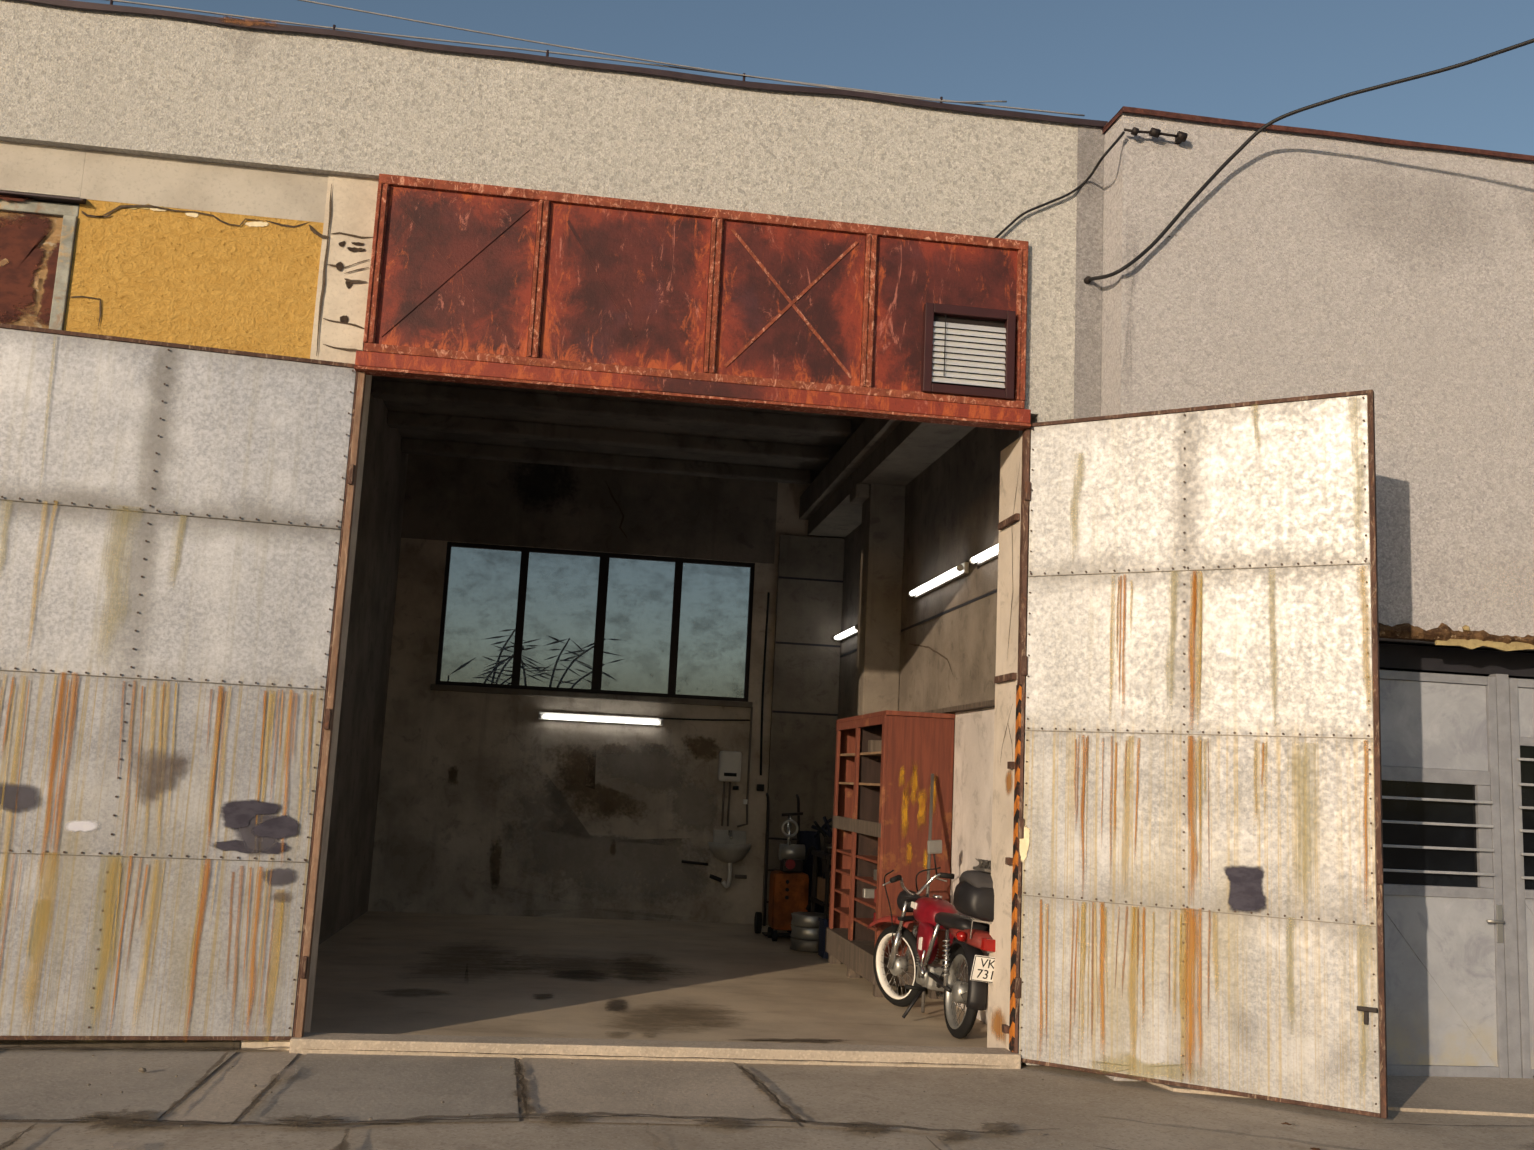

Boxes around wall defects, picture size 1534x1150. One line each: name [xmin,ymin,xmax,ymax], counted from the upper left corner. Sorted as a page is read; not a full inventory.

crack [81,184,372,356]
corrosion [1110,574,1132,696]
corrosion [1189,571,1202,706]
spalling [1379,622,1534,651]
corrosion [30,672,79,1001]
corrosion [207,686,229,841]
corrosion [1075,734,1140,873]
corrosion [1188,736,1209,888]
corrosion [187,859,283,1028]
corrosion [1039,899,1048,1041]
corrosion [1070,902,1210,1062]
crack [0,1045,1042,1150]